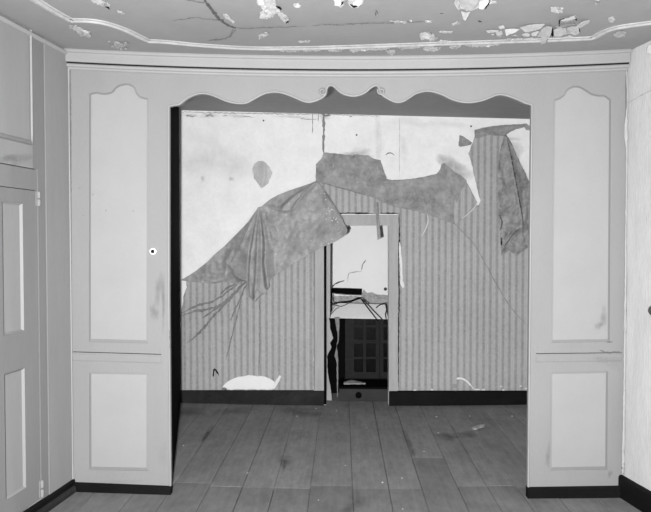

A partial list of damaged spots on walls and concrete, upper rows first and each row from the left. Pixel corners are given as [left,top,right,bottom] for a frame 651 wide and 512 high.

peeling [257,0,289,24]
crack [174,0,427,41]
peeling [334,0,363,8]
peeling [350,0,590,55]